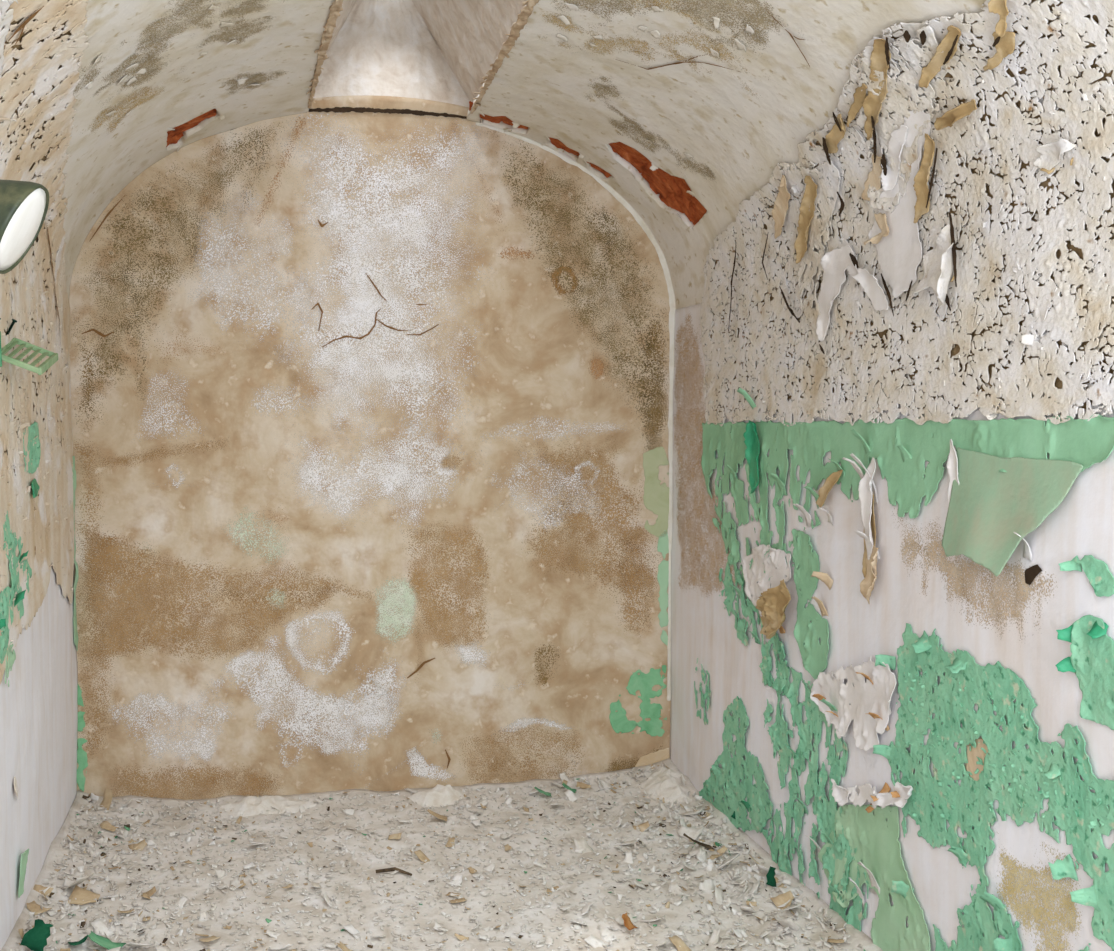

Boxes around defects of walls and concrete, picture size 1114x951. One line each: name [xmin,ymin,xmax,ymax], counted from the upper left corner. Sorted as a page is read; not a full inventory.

flaking render [0,0,92,687]
damp [71,112,669,800]
crack [311,275,439,347]
peeling [643,0,1114,951]
peeling [18,848,29,898]
peeling [20,919,53,951]